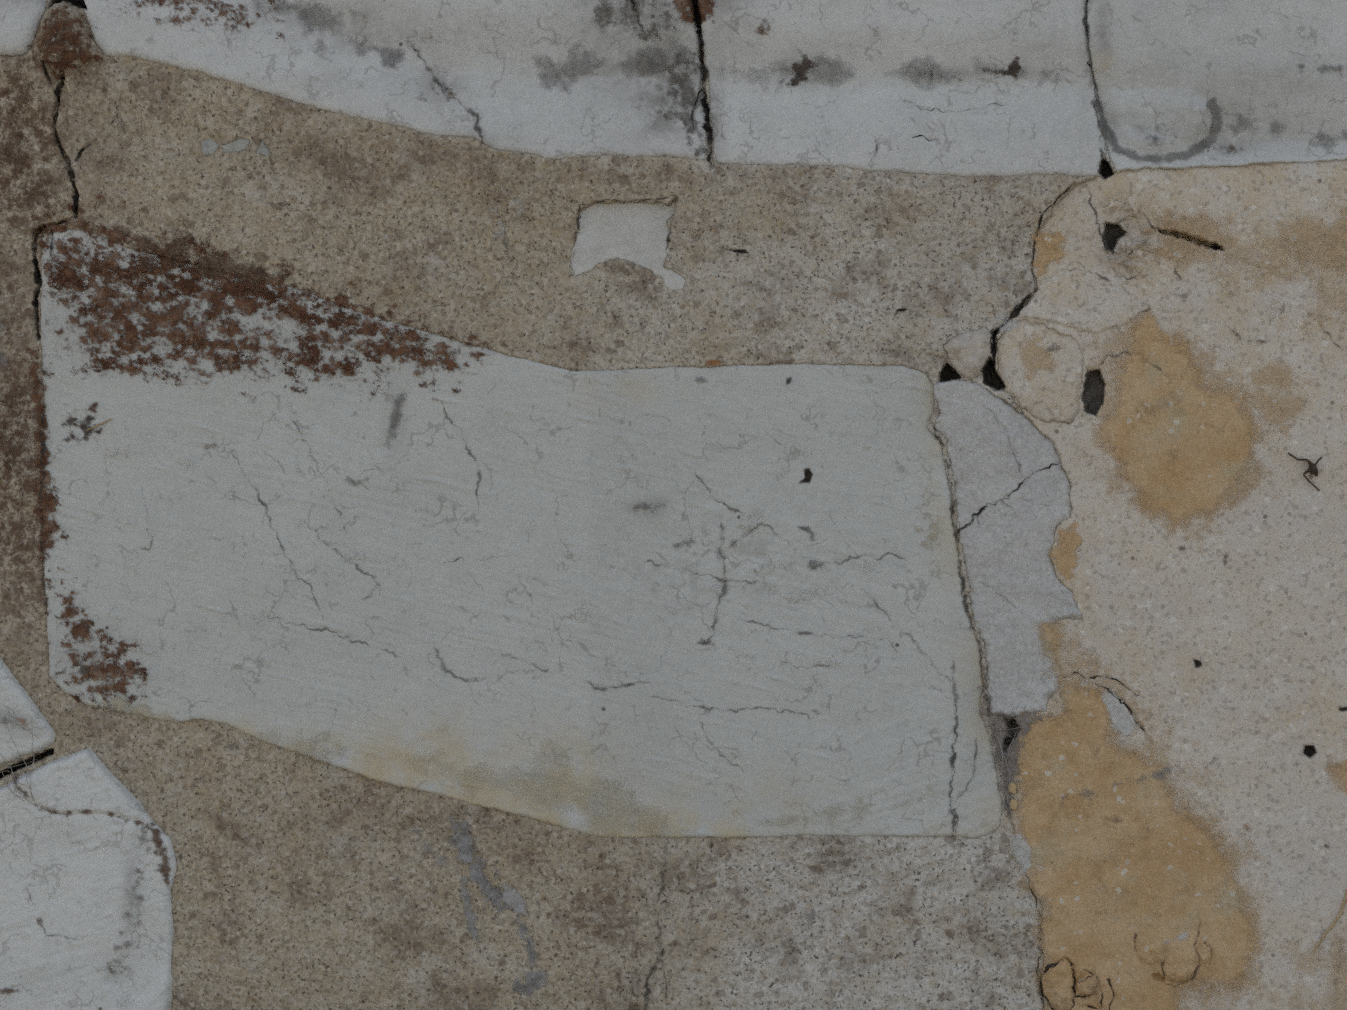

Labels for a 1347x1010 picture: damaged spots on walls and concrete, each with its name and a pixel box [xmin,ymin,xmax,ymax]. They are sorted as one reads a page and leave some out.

corrosion [668,0,717,32]
crack [690,0,713,165]
crack [31,61,125,338]
corrosion [0,84,489,401]
flaking render [570,201,686,293]
peeling [1031,231,1065,276]
peeling [1149,211,1316,282]
peeling [1089,312,1268,537]
corrosion [0,320,148,712]
peeling [1048,523,1082,579]
peeling [1012,622,1261,1010]